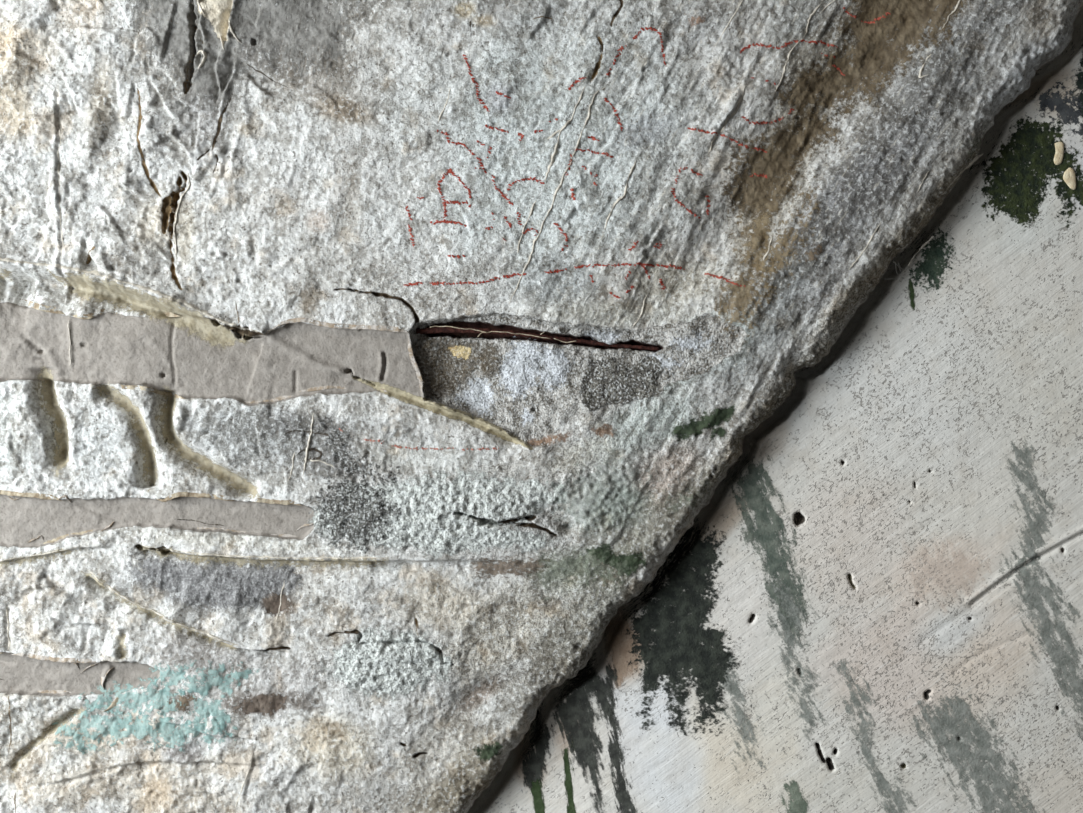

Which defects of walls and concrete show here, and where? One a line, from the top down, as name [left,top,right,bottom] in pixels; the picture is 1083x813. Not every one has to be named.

peeling [111,0,373,120]
crack [590,0,623,82]
leakage [1009,39,1083,142]
crack [137,88,233,290]
leakage [702,0,986,339]
peeling [0,299,747,448]
peeling [0,490,317,548]
crack [499,515,557,536]
leakage [723,451,824,748]
peeling [0,652,160,712]
leakage [519,517,765,813]